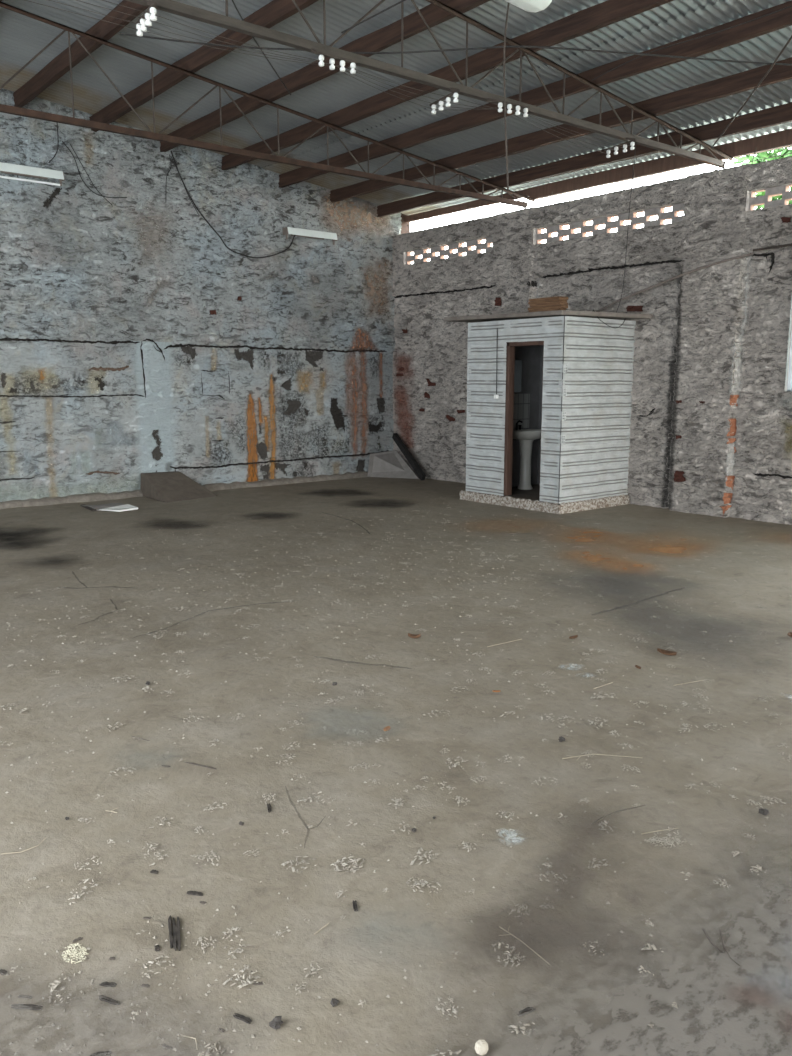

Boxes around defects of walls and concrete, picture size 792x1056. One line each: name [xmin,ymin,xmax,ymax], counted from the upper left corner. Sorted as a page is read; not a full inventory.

flaking render [176,346,198,366]
crack [86,468,120,476]
flaking render [151,430,163,472]
crack [0,337,388,471]
corrosion [247,374,276,482]
peeling [209,349,350,480]
flaking render [368,396,386,434]
flaking render [719,346,740,516]
crack [753,472,792,480]